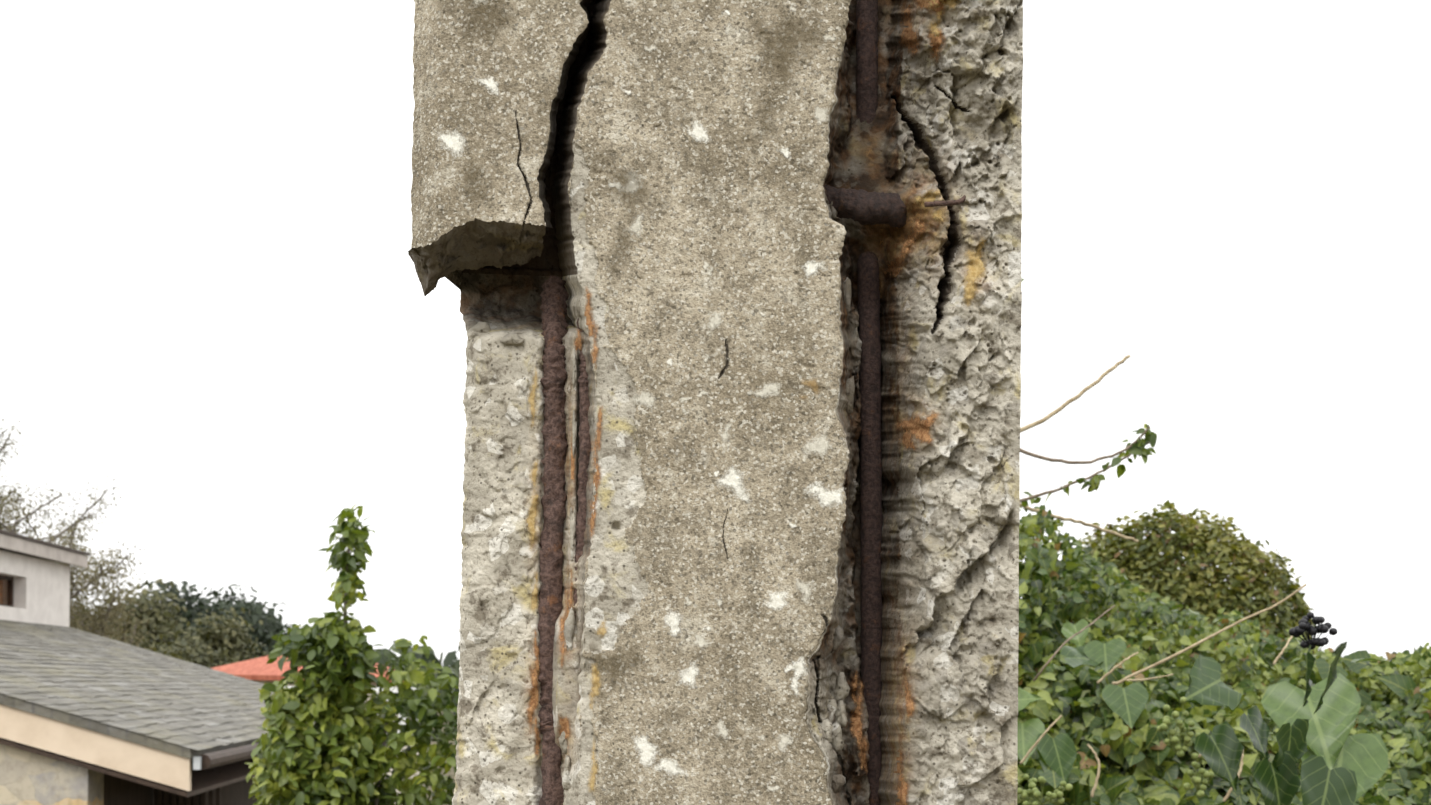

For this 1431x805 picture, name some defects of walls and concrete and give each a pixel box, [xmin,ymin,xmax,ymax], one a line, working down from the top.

rust [899,0,957,58]
crack [462,0,612,277]
crack [934,85,970,112]
crack [891,95,961,334]
rust [575,289,598,363]
spalling [452,141,649,805]
rust [590,407,602,535]
spalling [806,0,1023,805]
rust [897,413,938,450]
rust [527,631,541,755]
rust [559,717,570,739]
rust [851,675,868,770]